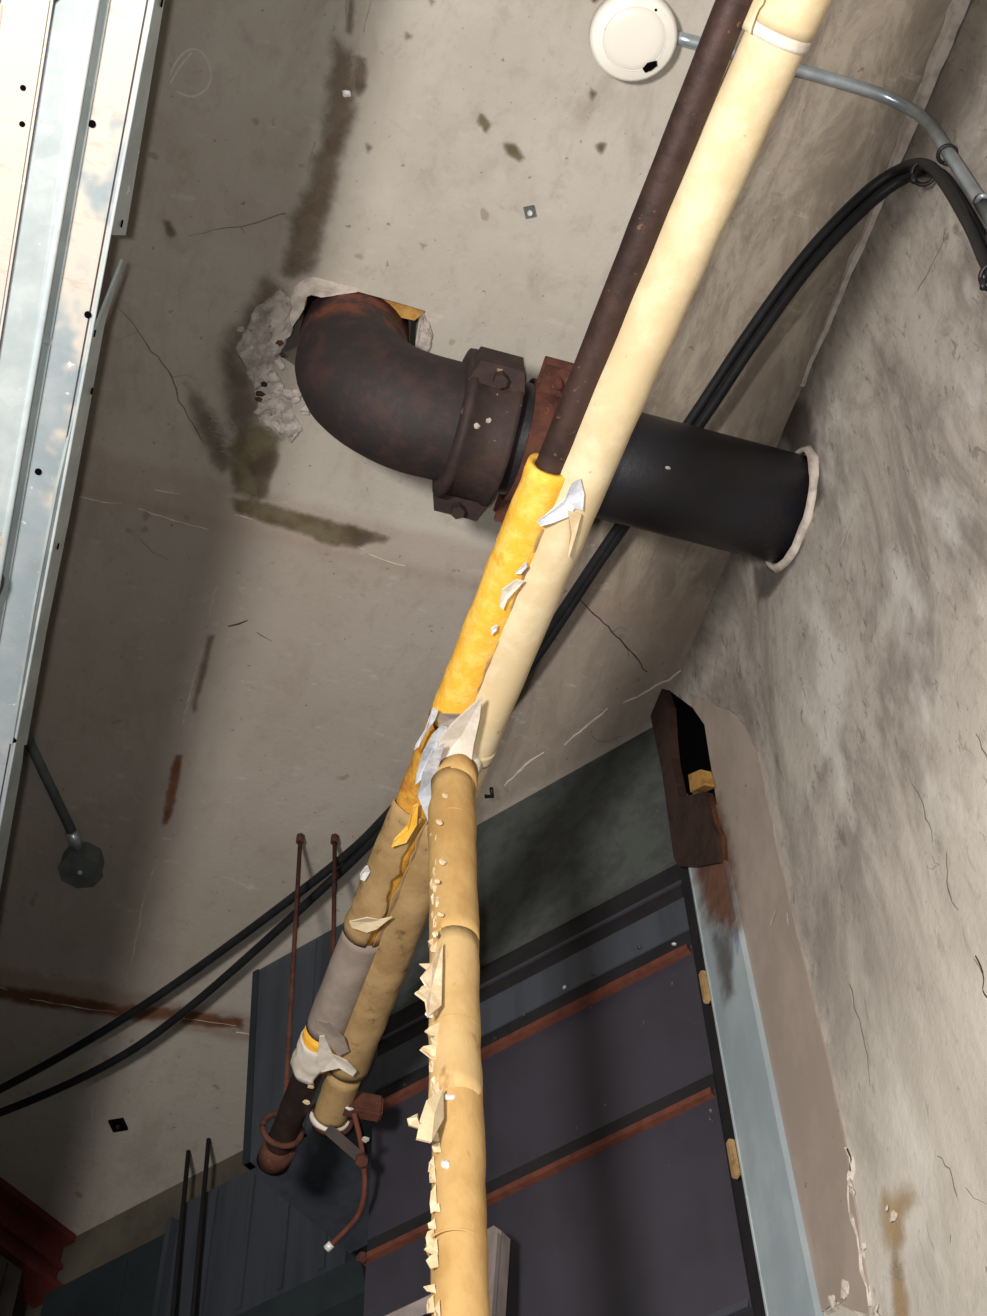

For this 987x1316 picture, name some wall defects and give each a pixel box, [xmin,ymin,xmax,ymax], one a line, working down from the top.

damp [285,45,365,277]
damp [197,287,386,546]
spalling [235,277,360,443]
spalling [417,311,434,352]
corrosion [163,756,181,824]
corrosion [697,806,739,991]
crack [912,784,958,910]
crack [974,955,987,1002]
peeling [823,1147,880,1316]